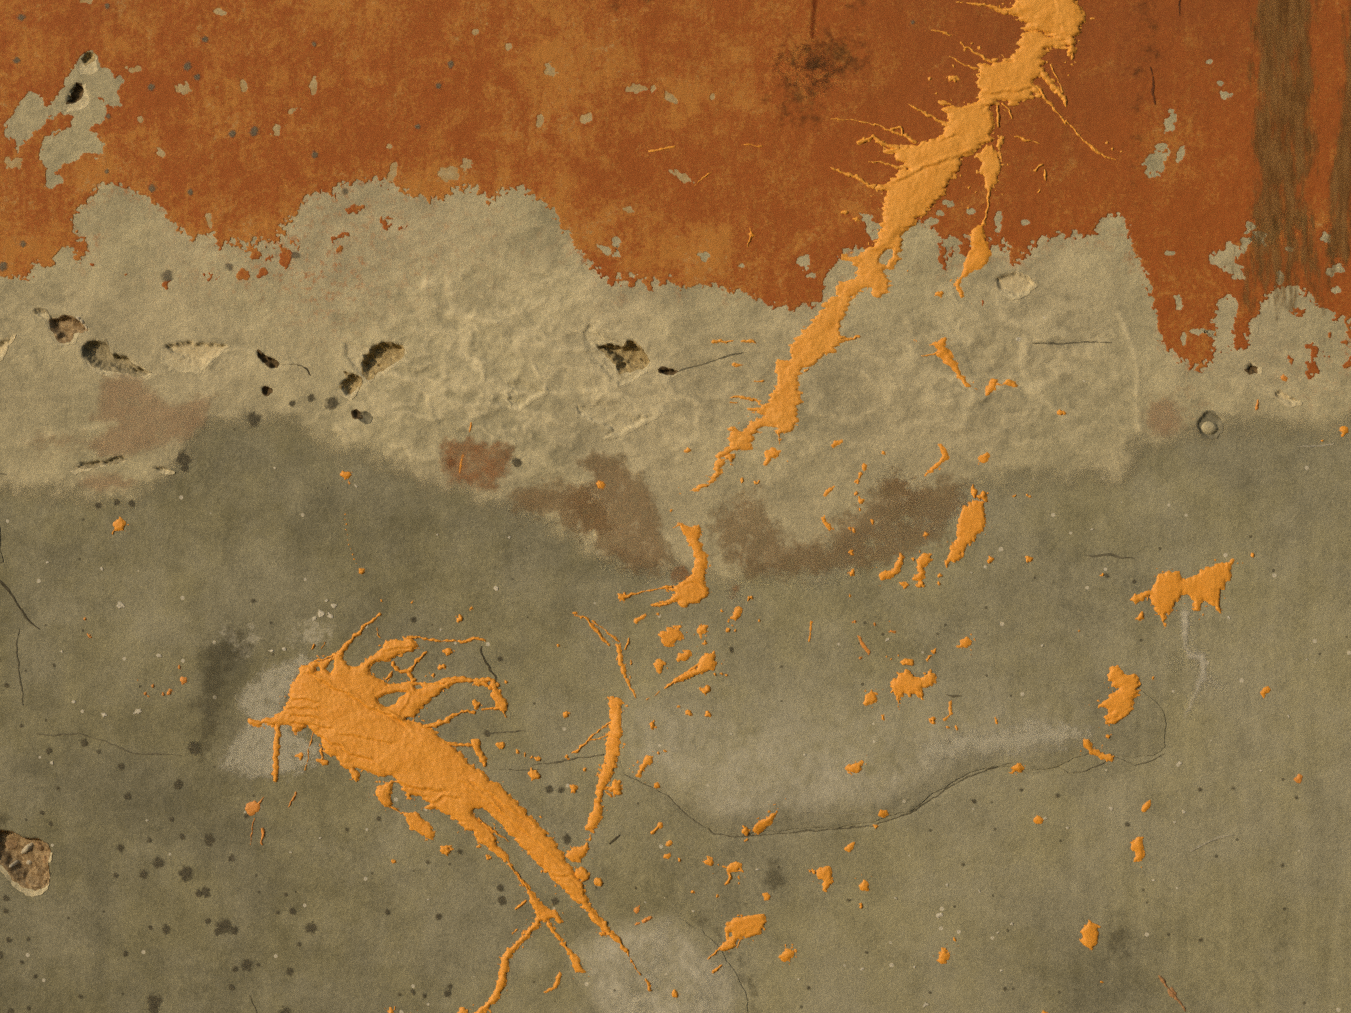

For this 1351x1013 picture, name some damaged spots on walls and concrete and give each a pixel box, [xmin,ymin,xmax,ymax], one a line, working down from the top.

peeling [1142,109,1186,178]
peeling [0,144,1351,584]
crack [0,581,182,756]
spalling [0,830,52,897]